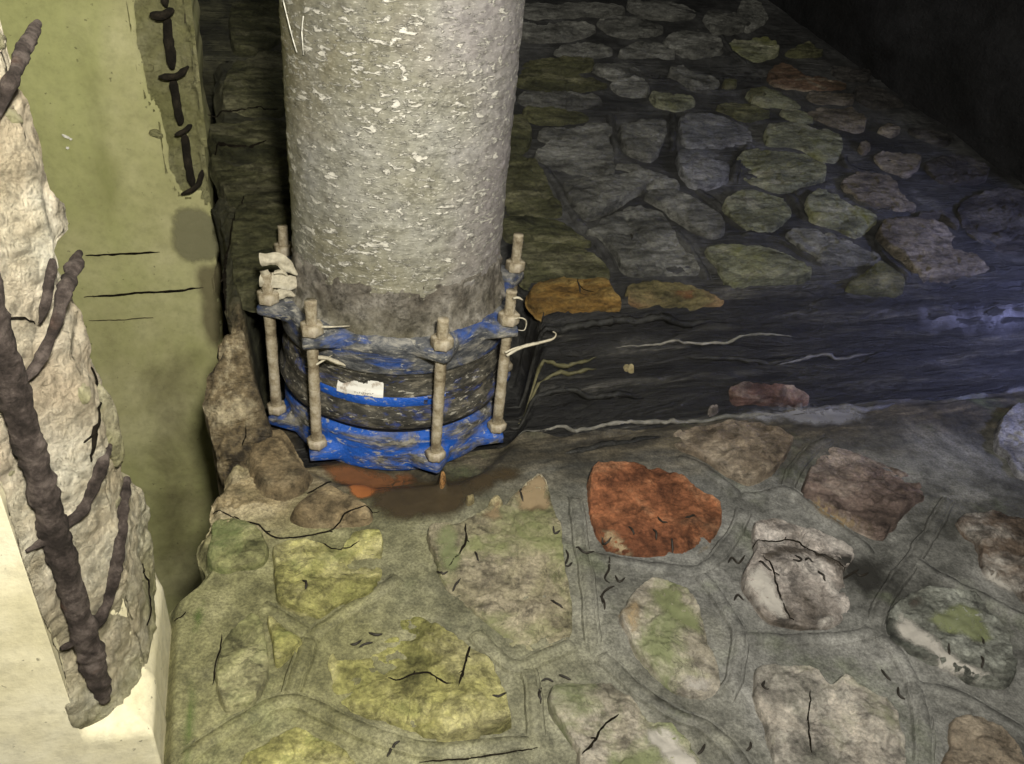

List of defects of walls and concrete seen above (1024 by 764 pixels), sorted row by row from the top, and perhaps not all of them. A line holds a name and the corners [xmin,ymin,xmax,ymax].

crack [209,106,278,155]
crack [85,196,244,321]
crack [83,367,102,462]
rust [326,466,411,498]
water stain [373,468,549,519]
crack [213,505,379,550]
crack [752,537,845,620]
crack [388,646,471,686]